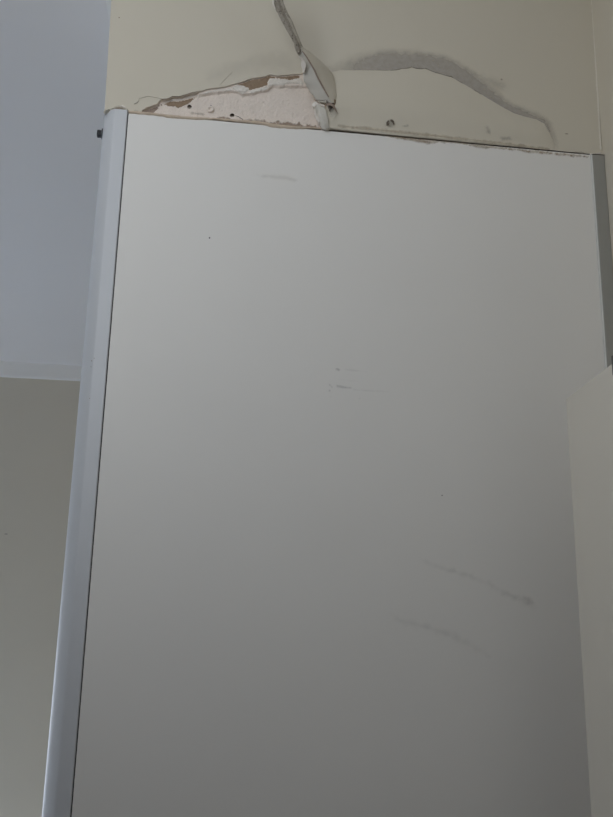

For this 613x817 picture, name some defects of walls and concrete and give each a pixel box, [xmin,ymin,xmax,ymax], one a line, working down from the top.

flaking render [144,0,337,131]
crack [329,130,590,155]